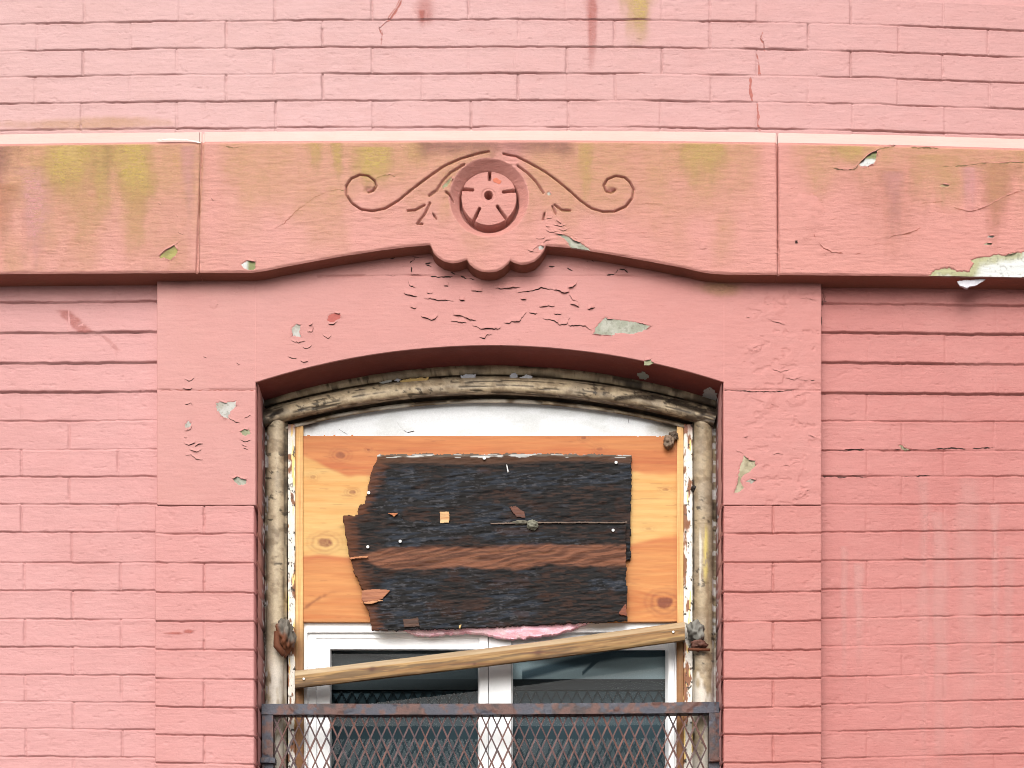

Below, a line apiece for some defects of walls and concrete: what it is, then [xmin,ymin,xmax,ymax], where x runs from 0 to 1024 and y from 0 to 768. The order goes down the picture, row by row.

crack [749,32,765,131]
crack [834,144,1024,170]
leakage [0,144,193,235]
spalling [158,230,183,263]
spalling [241,258,256,270]
spalling [929,233,1024,289]
peeling [404,275,654,339]
peeling [287,310,343,363]
peeling [216,398,251,450]
peeling [733,447,758,494]
crack [822,447,867,478]
crack [895,444,993,452]